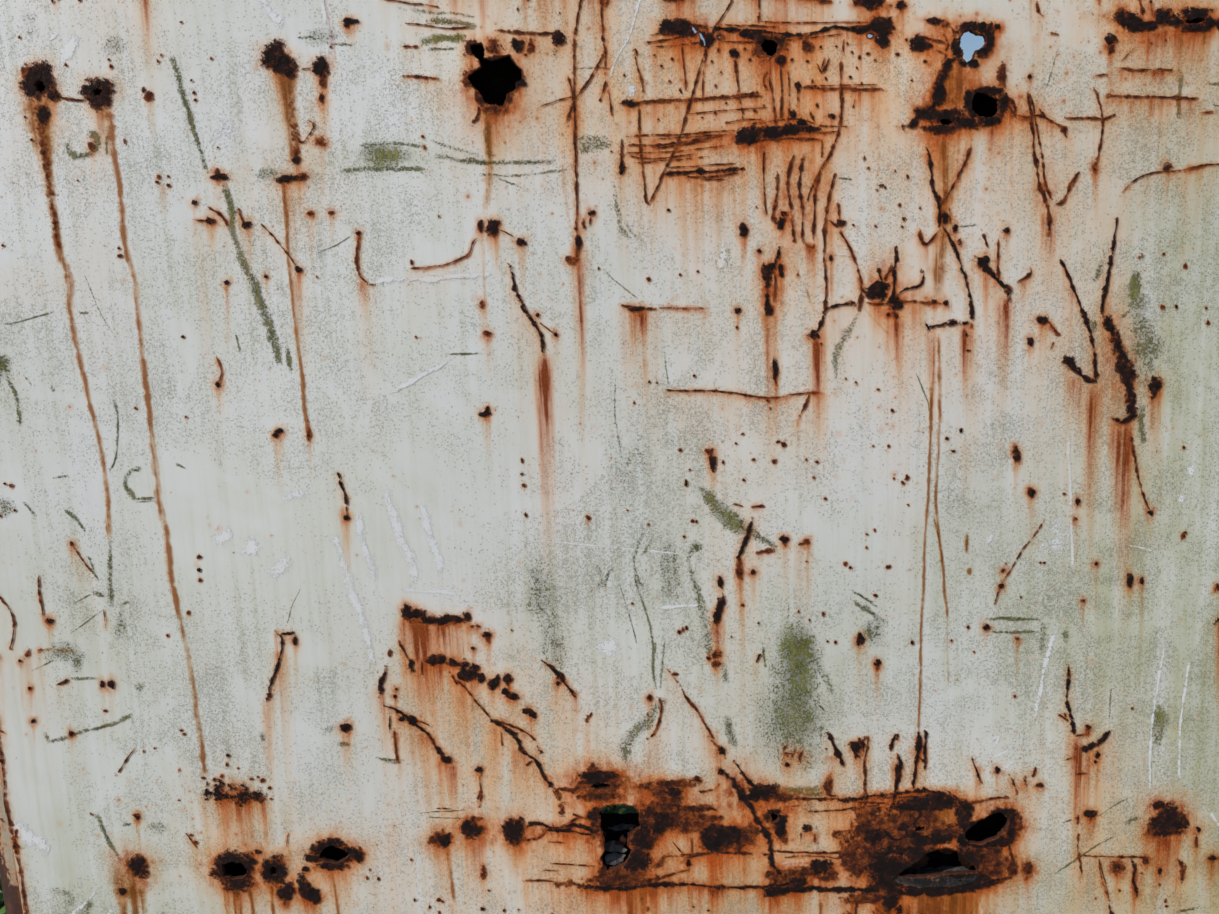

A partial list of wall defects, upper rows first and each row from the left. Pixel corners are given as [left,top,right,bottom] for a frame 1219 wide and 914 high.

corrosion [732,103,822,149]
corrosion [259,38,332,442]
corrosion [861,246,948,336]
corrosion [1136,375,1163,443]
corrosion [400,603,537,719]
corrosion [628,775,760,856]
corrosion [1143,800,1201,883]
corrosion [275,871,321,906]